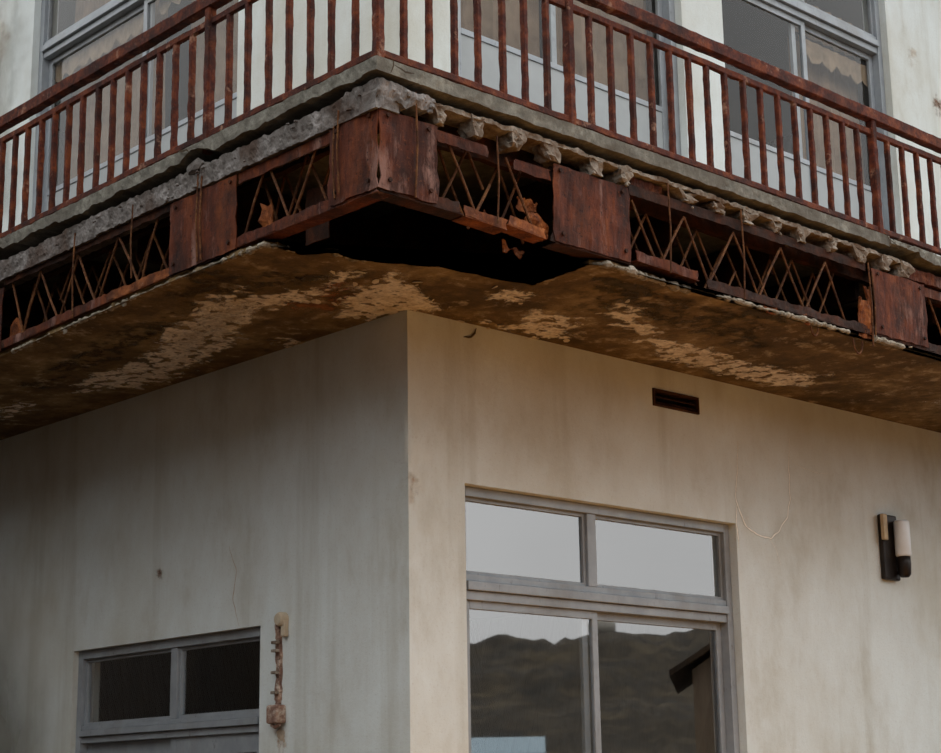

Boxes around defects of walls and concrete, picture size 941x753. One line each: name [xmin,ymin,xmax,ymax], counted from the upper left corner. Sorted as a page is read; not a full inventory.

spalling [0,77,941,294]
water stain [592,277,787,347]